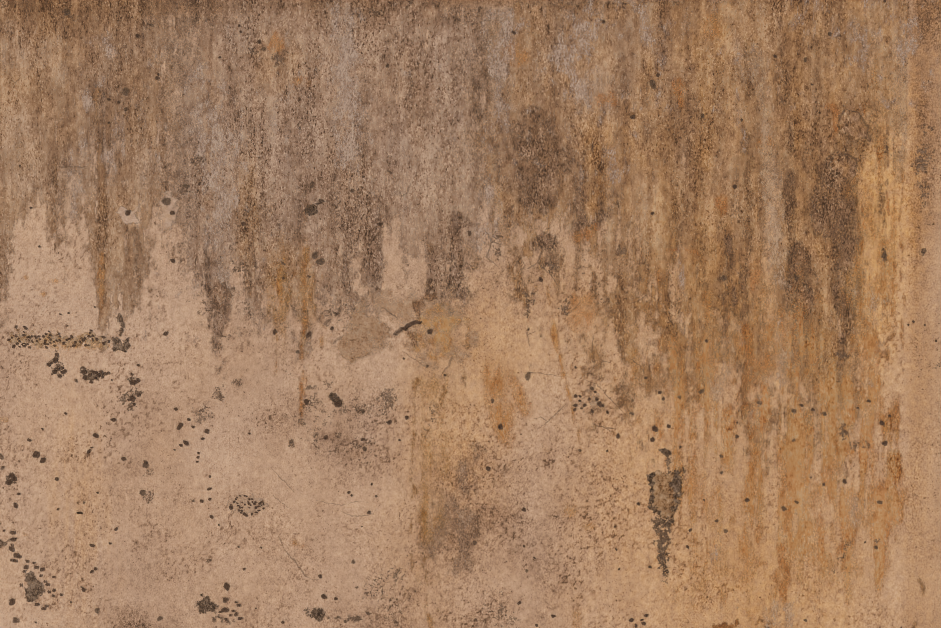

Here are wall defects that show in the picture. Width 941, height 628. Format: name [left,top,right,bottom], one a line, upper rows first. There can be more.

water stain [0,0,917,455]
rust [655,217,905,602]